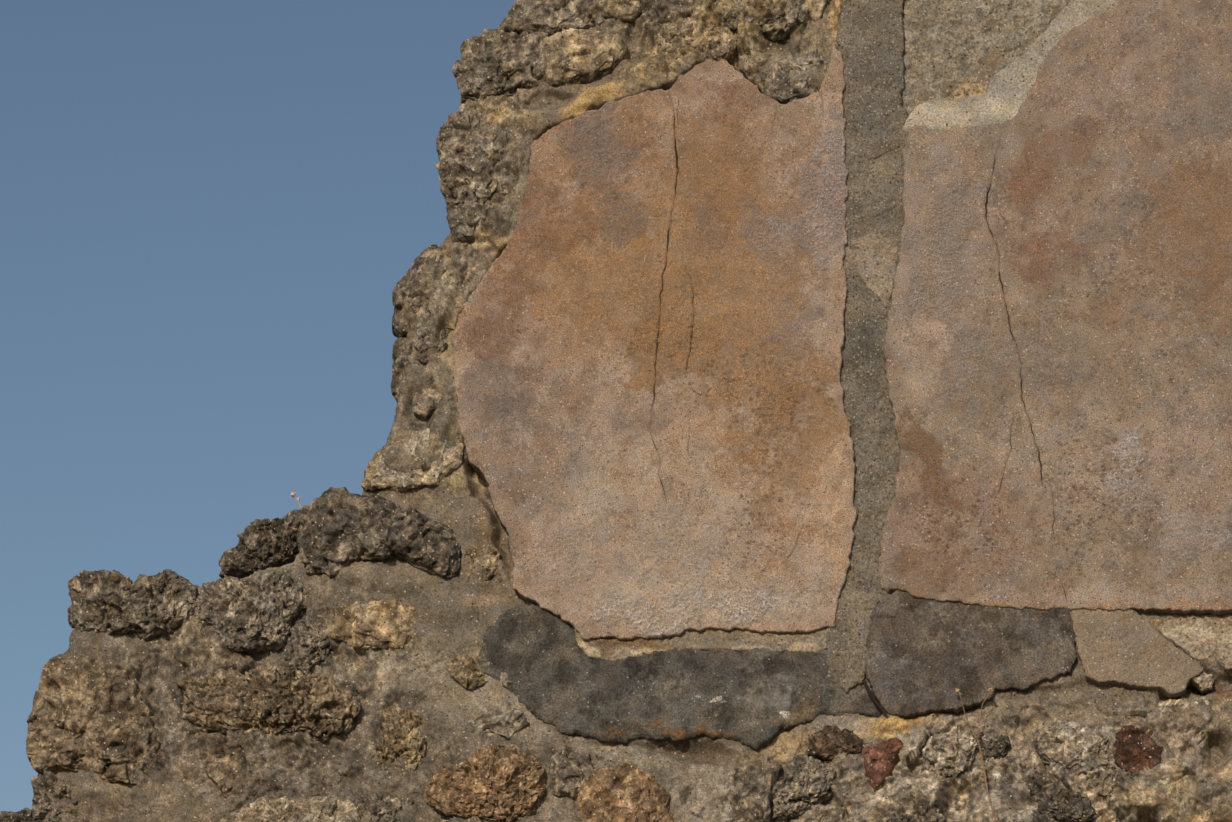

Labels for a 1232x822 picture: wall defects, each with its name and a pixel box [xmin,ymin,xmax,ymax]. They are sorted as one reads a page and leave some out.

crack [650,91,694,504]
crack [985,144,1055,538]